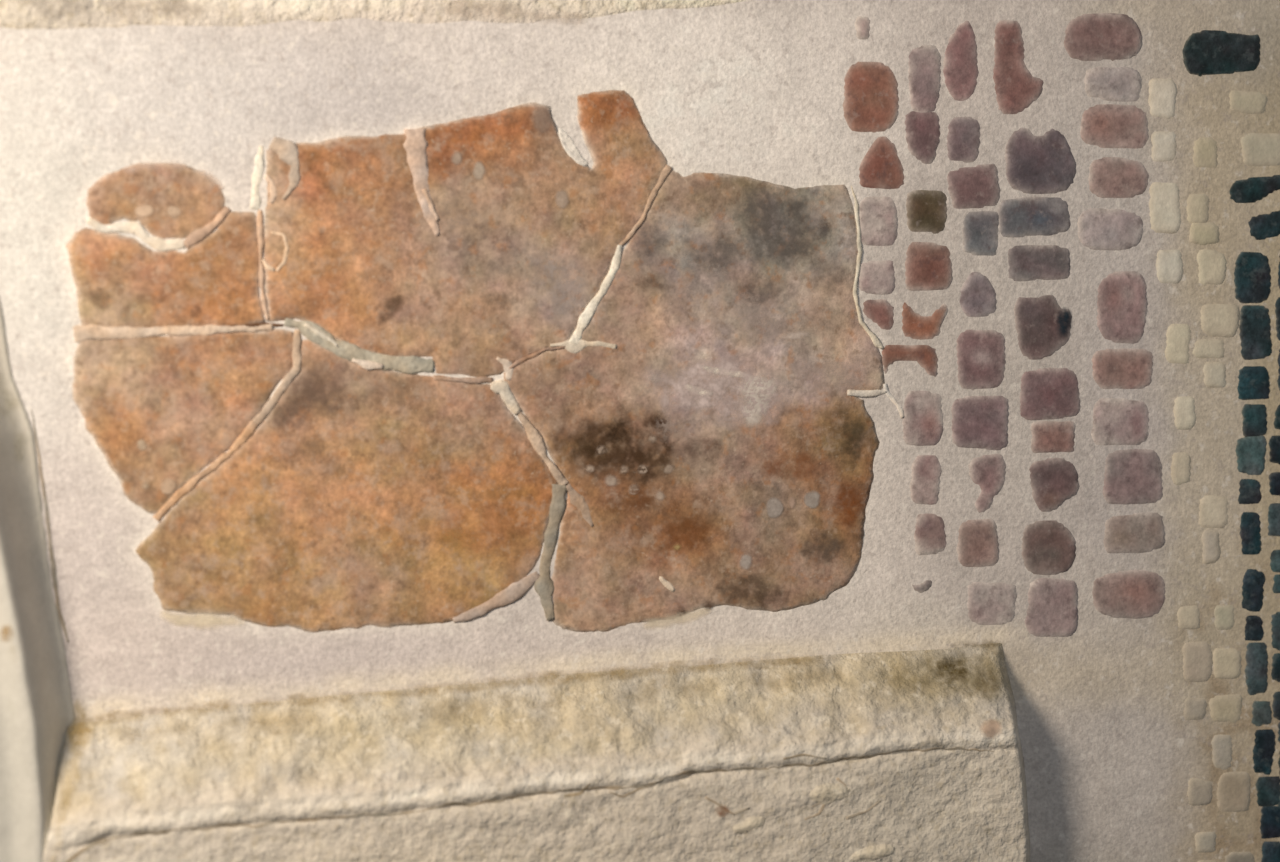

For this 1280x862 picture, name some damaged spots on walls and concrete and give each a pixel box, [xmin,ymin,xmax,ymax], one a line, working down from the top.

crack [67,747,994,862]